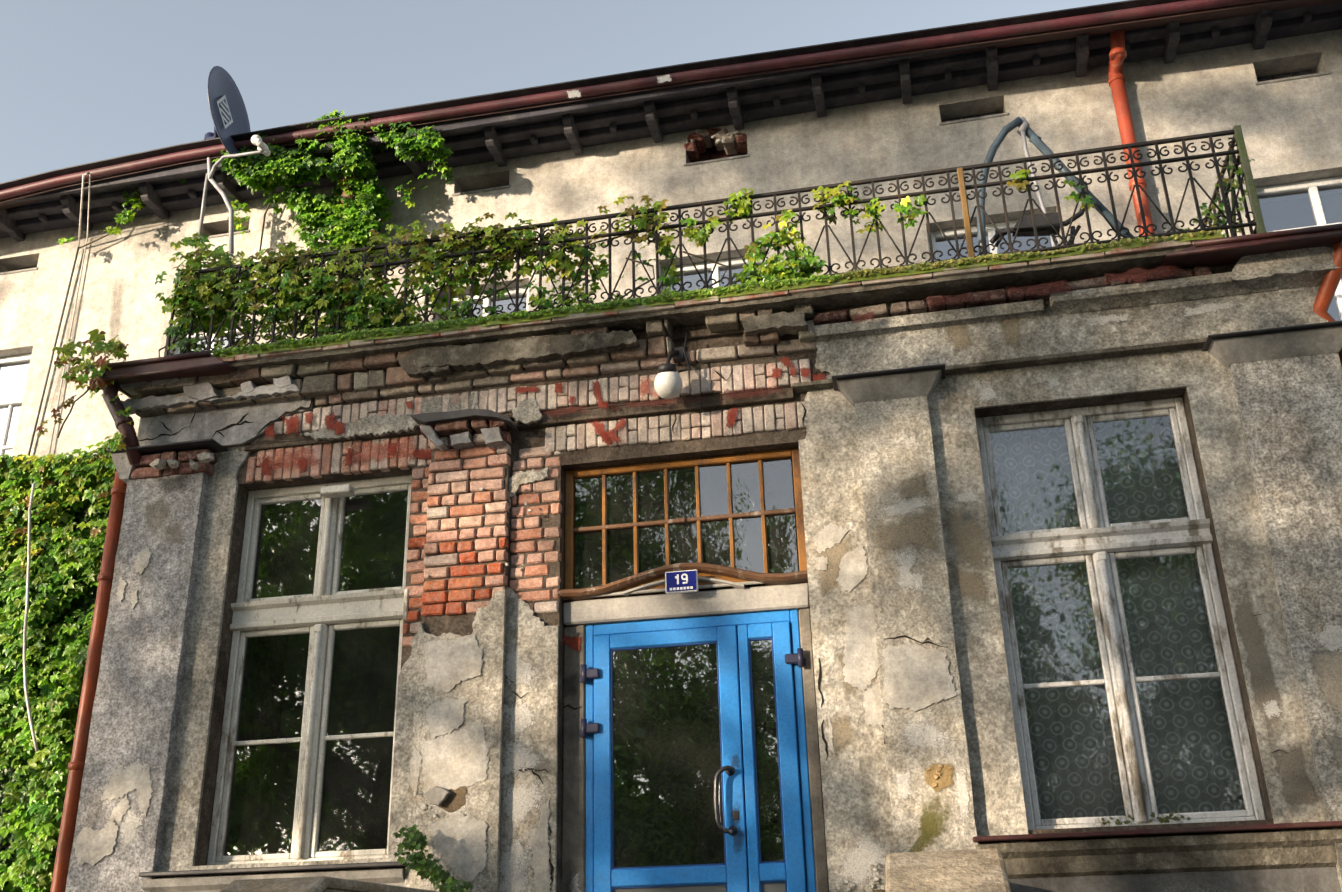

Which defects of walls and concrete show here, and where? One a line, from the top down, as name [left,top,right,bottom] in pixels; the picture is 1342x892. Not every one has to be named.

flaking render [684,128,748,161]
crack [138,398,313,441]
flaking render [244,339,826,892]
crack [886,635,944,647]
peeling [1310,621,1342,652]
peeling [812,523,970,824]
peeling [1262,700,1283,719]
peeling [73,758,155,865]
peeling [837,833,887,892]